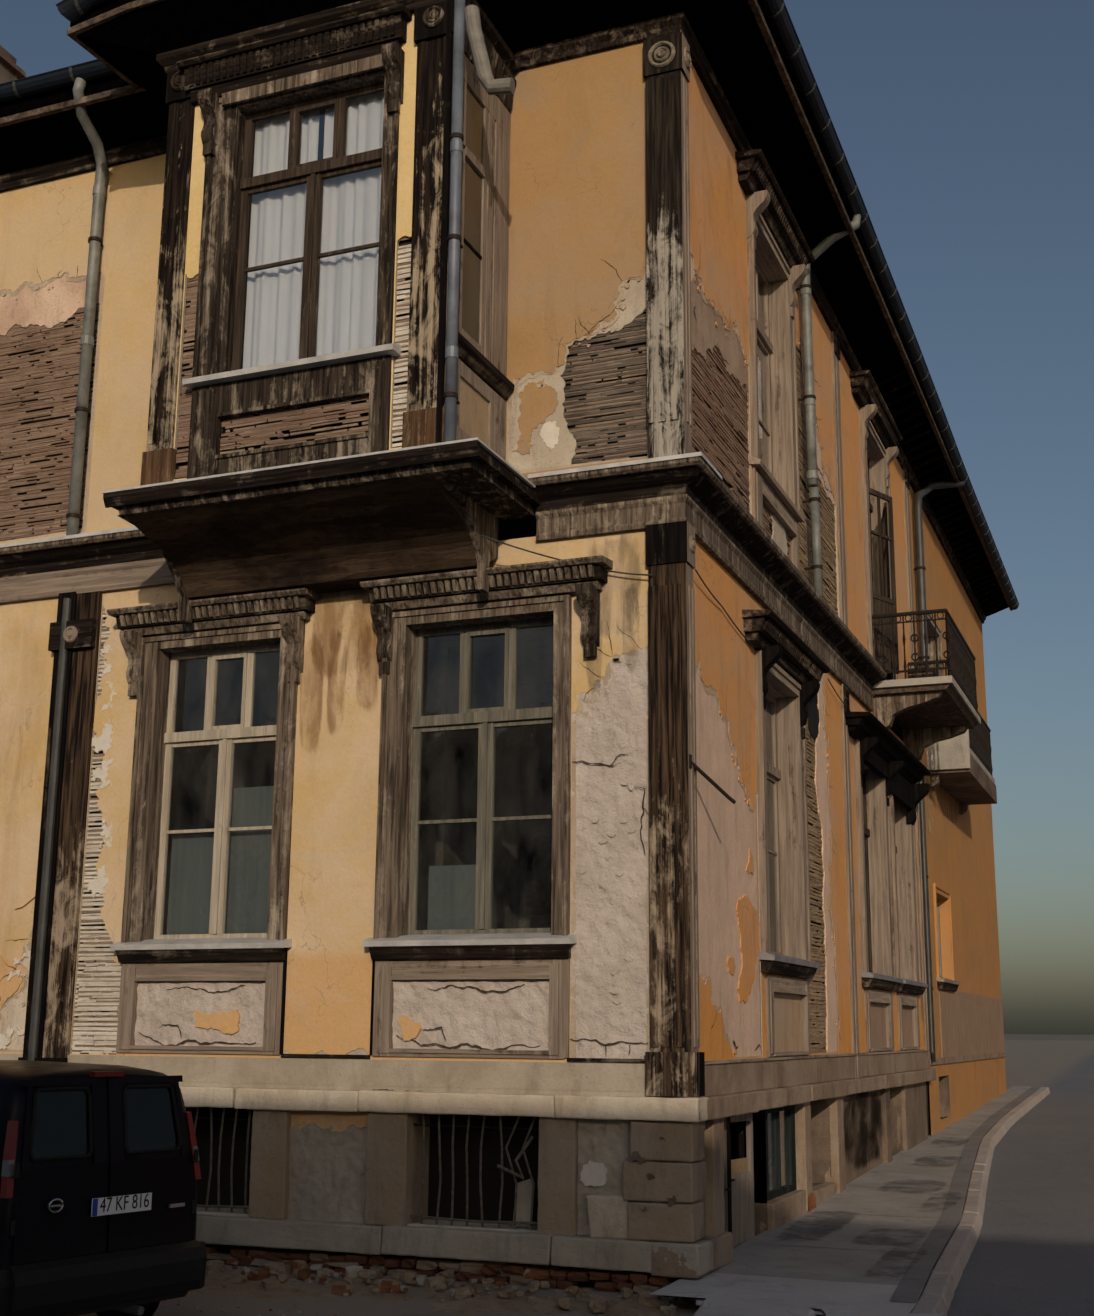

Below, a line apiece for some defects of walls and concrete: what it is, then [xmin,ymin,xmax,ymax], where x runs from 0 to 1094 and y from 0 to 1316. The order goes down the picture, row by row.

spalling [0,272,105,543]
flaking render [507,272,648,474]
flaking render [91,644,116,790]
flaking render [87,865,109,898]
flaking render [99,819,113,849]
flaking render [570,620,651,1059]
flaking render [695,661,762,1058]
flaking render [0,931,32,1052]
flaking render [134,981,265,1047]
flaking render [392,979,549,1050]
flaking render [288,1111,368,1222]